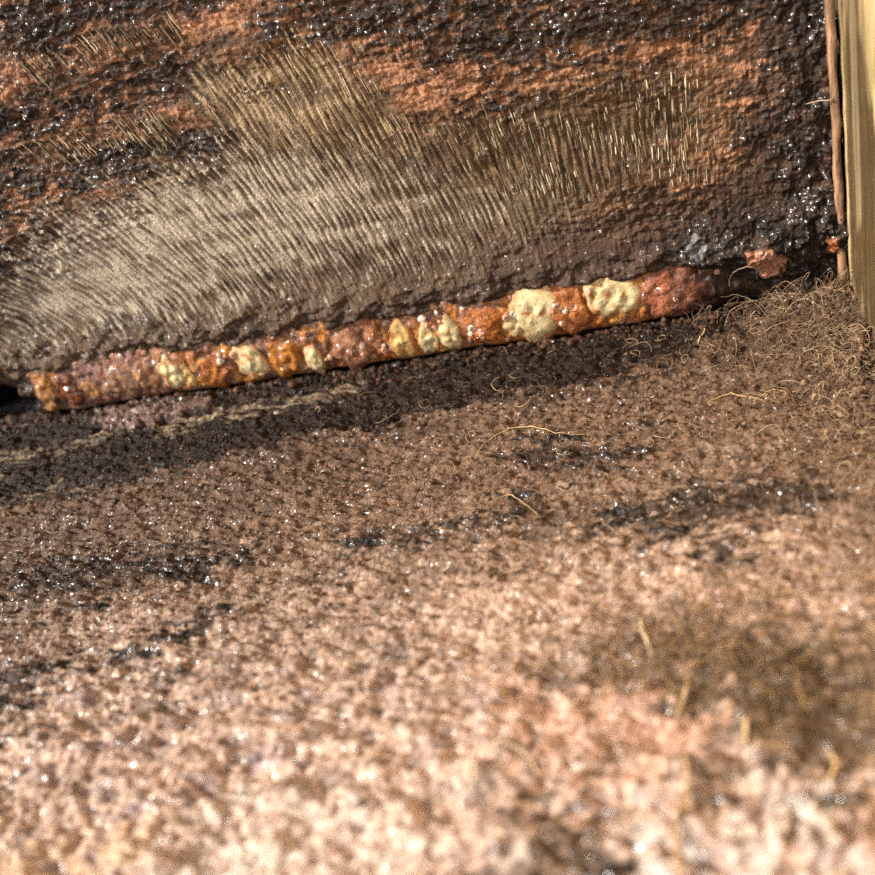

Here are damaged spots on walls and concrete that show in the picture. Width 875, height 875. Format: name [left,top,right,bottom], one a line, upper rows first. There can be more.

peeling [0,7,758,387]
rust [22,245,832,414]
leakage [0,0,875,333]
leakage [0,314,875,875]